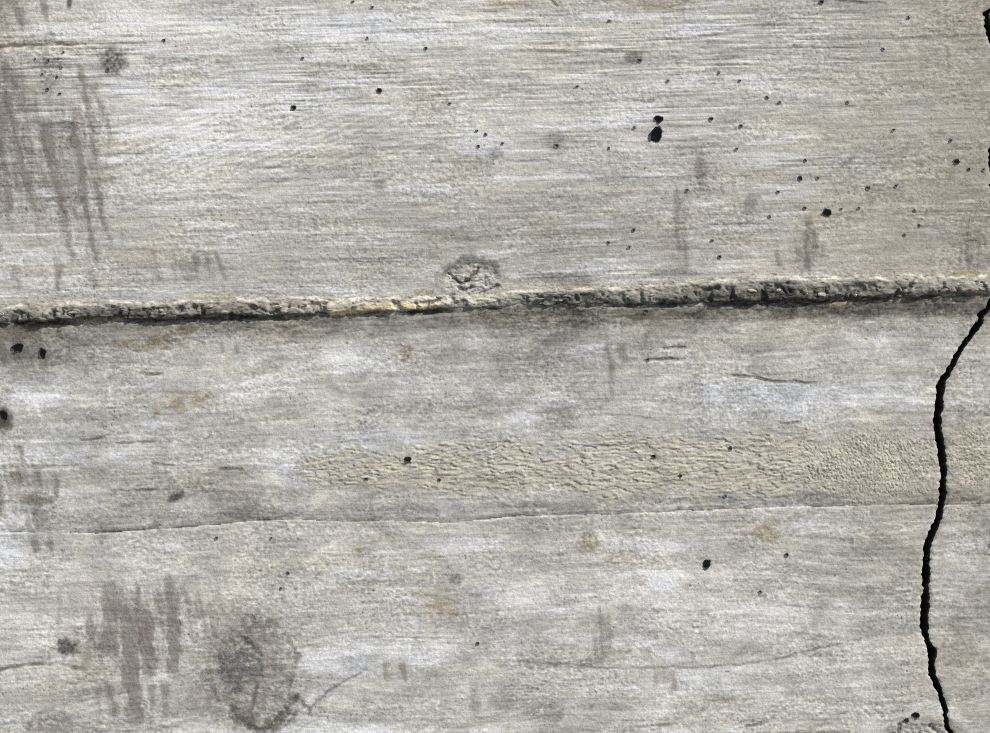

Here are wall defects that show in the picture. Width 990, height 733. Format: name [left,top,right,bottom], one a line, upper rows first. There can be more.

crack [982,8,990,44]
crack [919,299,990,733]